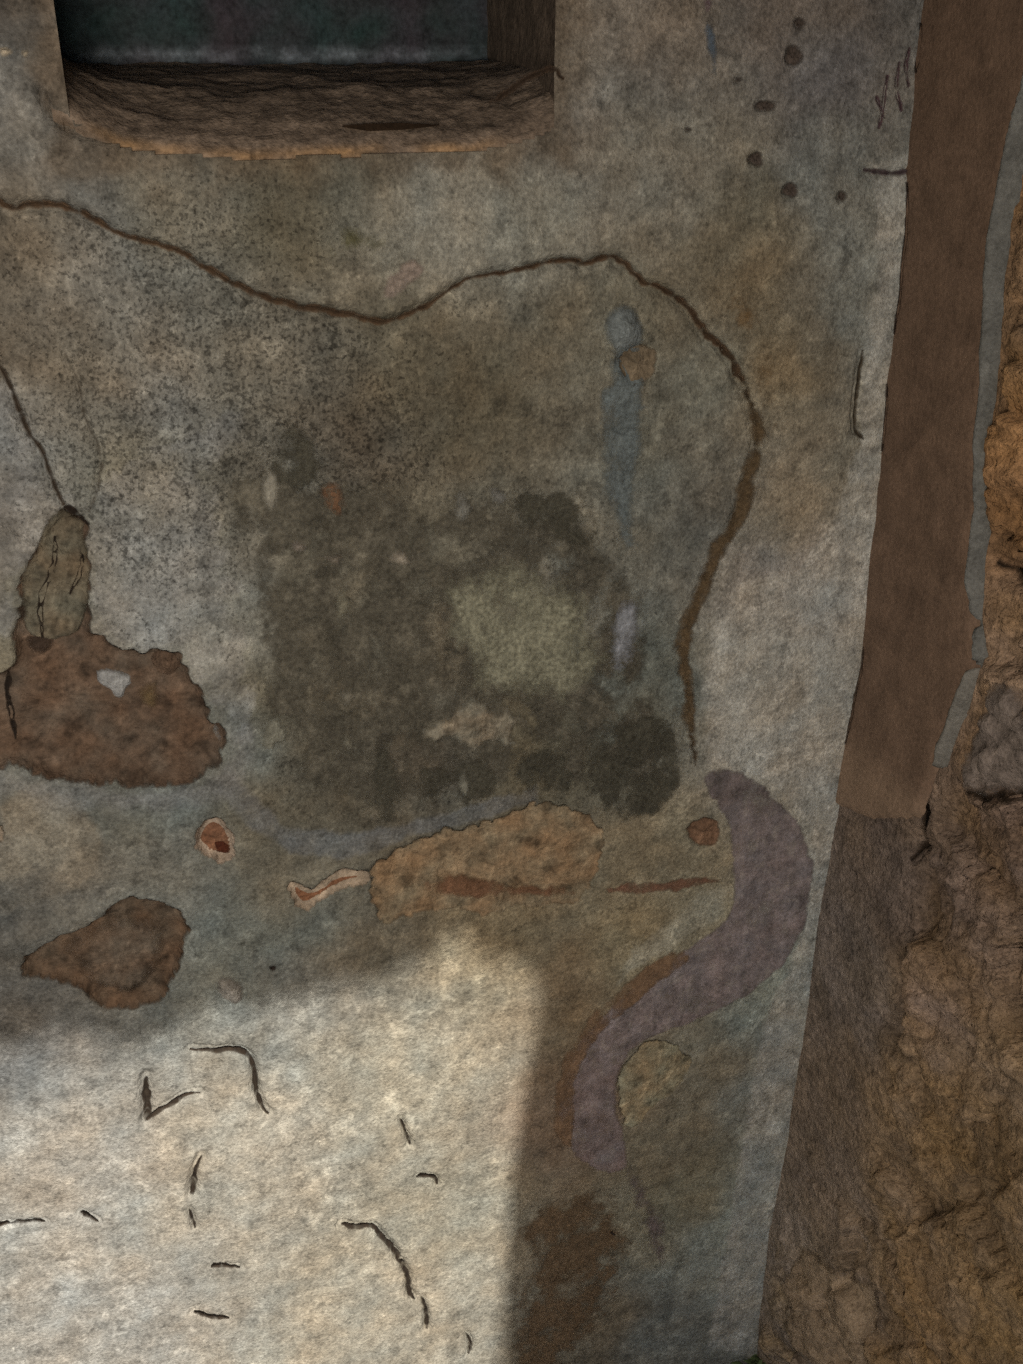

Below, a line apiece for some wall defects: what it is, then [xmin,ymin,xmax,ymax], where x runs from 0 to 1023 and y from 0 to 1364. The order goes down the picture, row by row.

crack [0,199,765,766]
spalling [0,505,226,788]
leakage [234,430,679,822]
peeling [287,802,605,924]
spalling [21,896,191,1009]
crack [0,1218,45,1226]
crack [141,1076,200,1121]
crack [189,1155,202,1228]
crack [194,1310,229,1320]
crack [190,1046,270,1114]
crack [342,1222,429,1329]
crack [401,1119,438,1185]